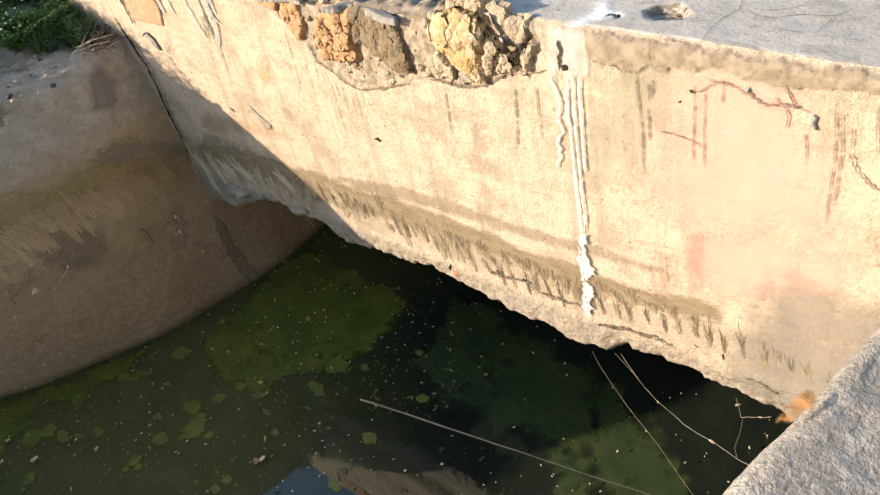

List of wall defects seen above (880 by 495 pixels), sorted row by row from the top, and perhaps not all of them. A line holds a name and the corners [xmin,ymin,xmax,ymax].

crack [114,0,186,147]
spalling [257,0,540,91]
crack [696,79,809,127]
crack [701,0,880,41]
leakage [0,0,719,321]
crack [849,154,879,191]